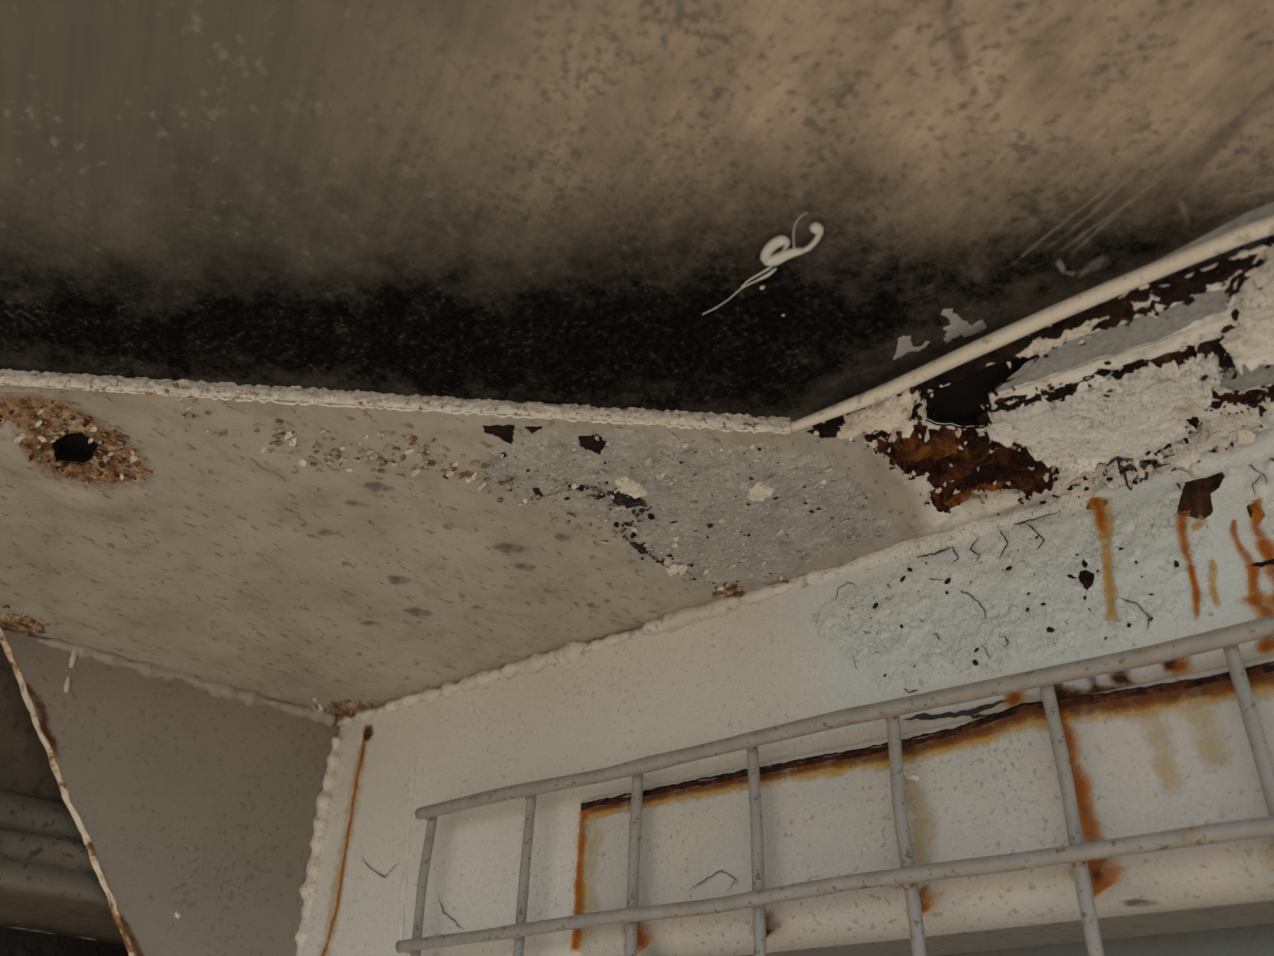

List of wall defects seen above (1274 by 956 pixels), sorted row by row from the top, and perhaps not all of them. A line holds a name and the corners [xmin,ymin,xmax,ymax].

rust [0,397,153,491]
spalling [0,369,791,550]
spalling [655,518,725,557]
spalling [768,468,868,538]
peeling [827,383,927,442]
spalling [886,562,986,618]
rust [863,245,1274,513]
peeling [959,235,1274,519]
rust [1177,472,1225,617]
rust [1230,498,1274,619]
rust [1053,670,1132,843]
rust [570,810,593,950]